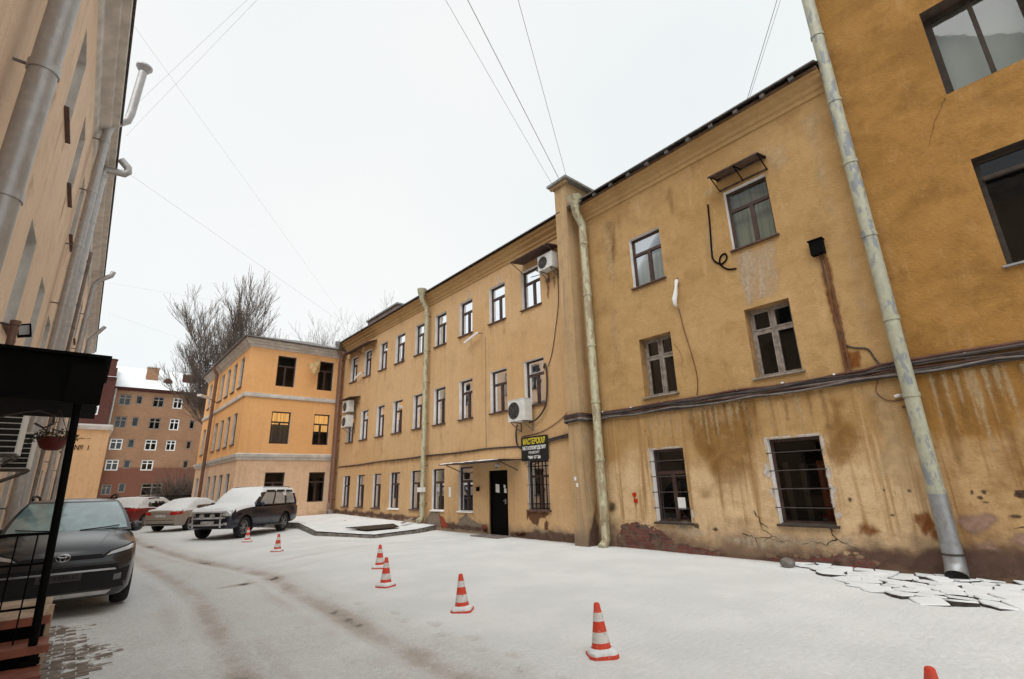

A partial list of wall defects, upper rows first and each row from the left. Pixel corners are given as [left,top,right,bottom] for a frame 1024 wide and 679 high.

corrosion [822,257,860,367]
damp [830,413,855,463]
peeling [763,433,841,519]
flaking render [616,509,721,557]
crack [742,511,861,552]
flaking render [958,490,996,534]